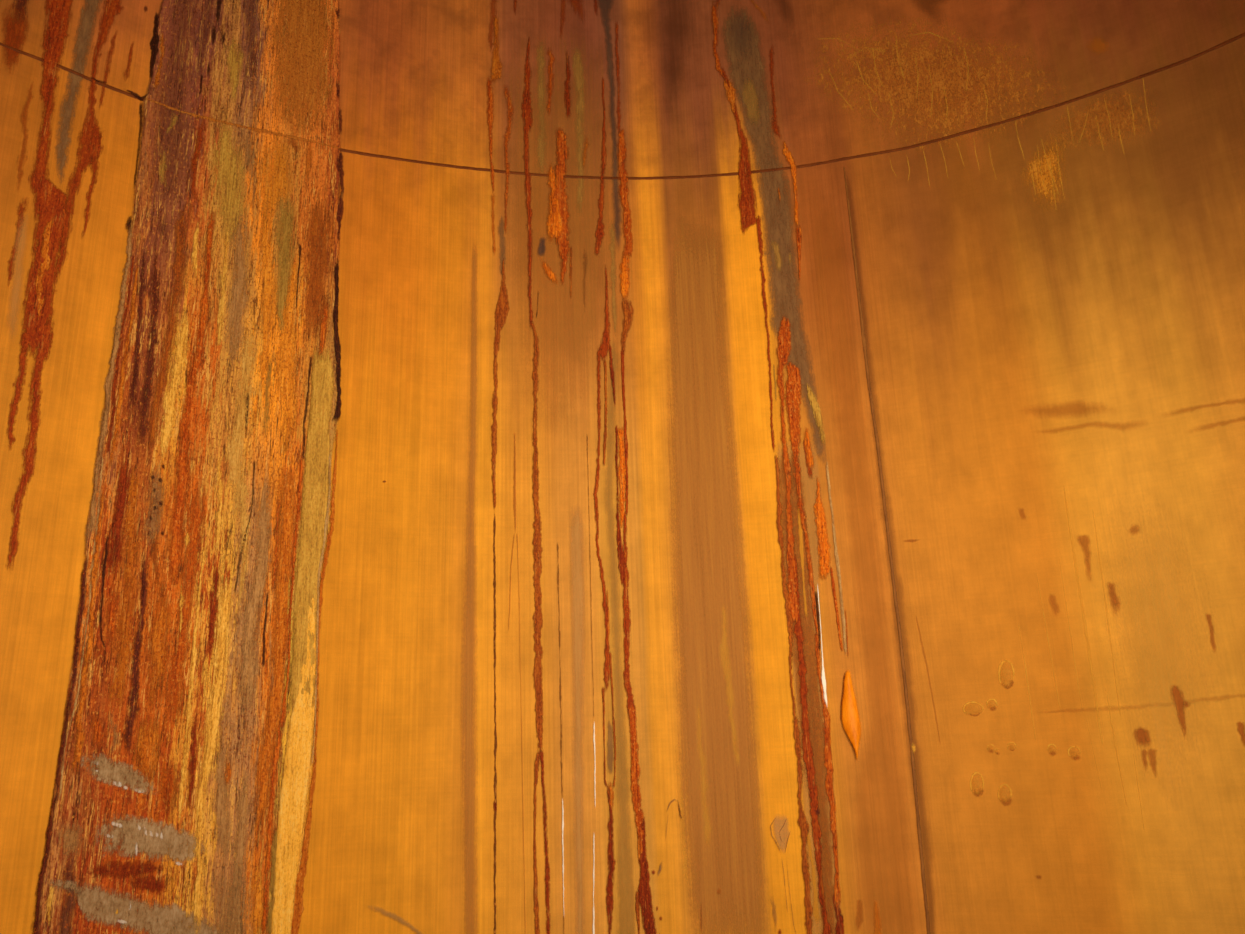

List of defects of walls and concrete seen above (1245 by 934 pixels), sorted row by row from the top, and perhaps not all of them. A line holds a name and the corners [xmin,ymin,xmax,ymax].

rust [4,0,27,65]
rust [8,0,123,564]
rust [34,0,344,934]
rust [487,0,550,934]
rust [594,23,662,934]
leakage [669,235,764,934]
rust [712,1,844,934]
rust [1135,728,1155,768]
rust [1172,686,1188,730]